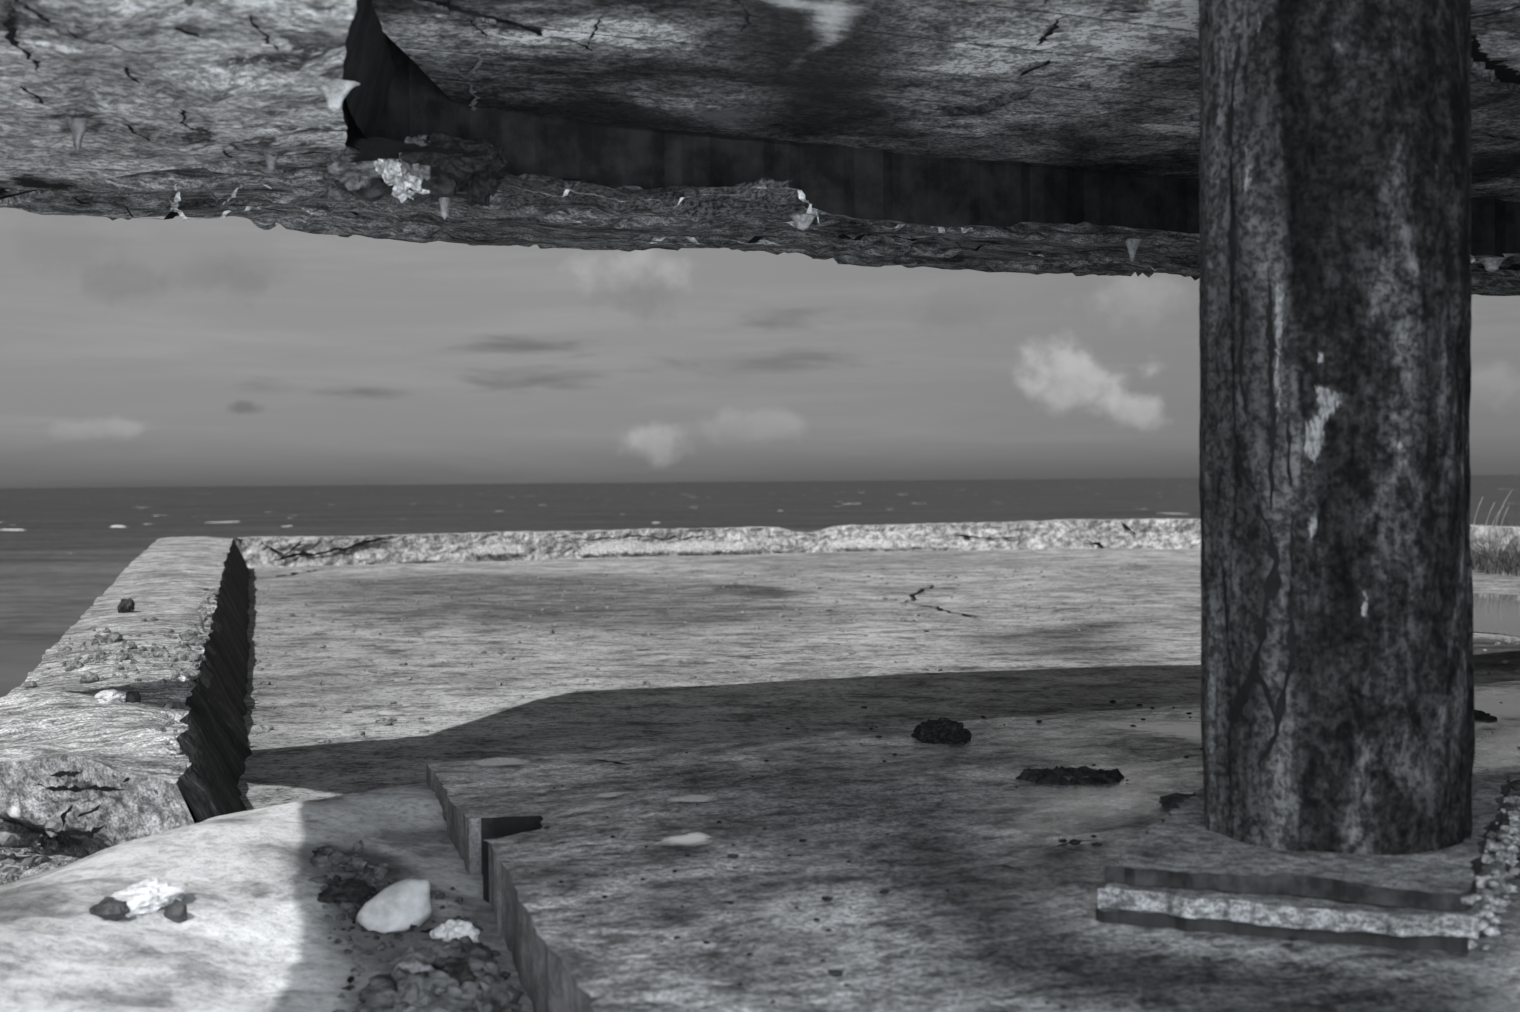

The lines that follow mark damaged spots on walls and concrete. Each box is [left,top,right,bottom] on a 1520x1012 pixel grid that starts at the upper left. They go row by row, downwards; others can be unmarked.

crack [407,0,603,111]
crack [929,0,1068,118]
crack [1470,4,1520,93]
spalling [0,177,74,198]
peeling [169,183,290,221]
spalling [322,131,820,225]
crack [1482,132,1520,142]